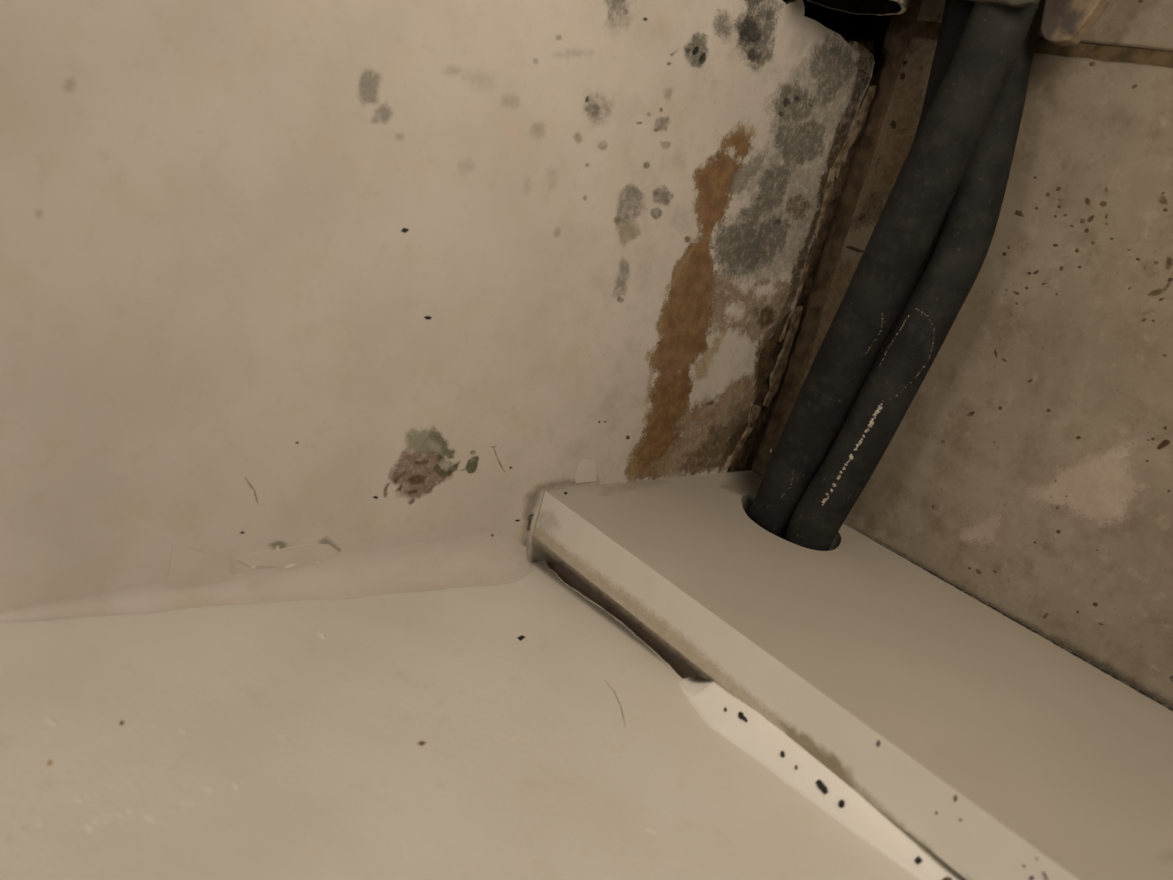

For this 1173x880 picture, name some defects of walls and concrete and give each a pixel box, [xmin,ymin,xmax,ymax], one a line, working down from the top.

water stain [667,0,777,69]
rust [625,129,753,481]
water stain [637,41,854,477]